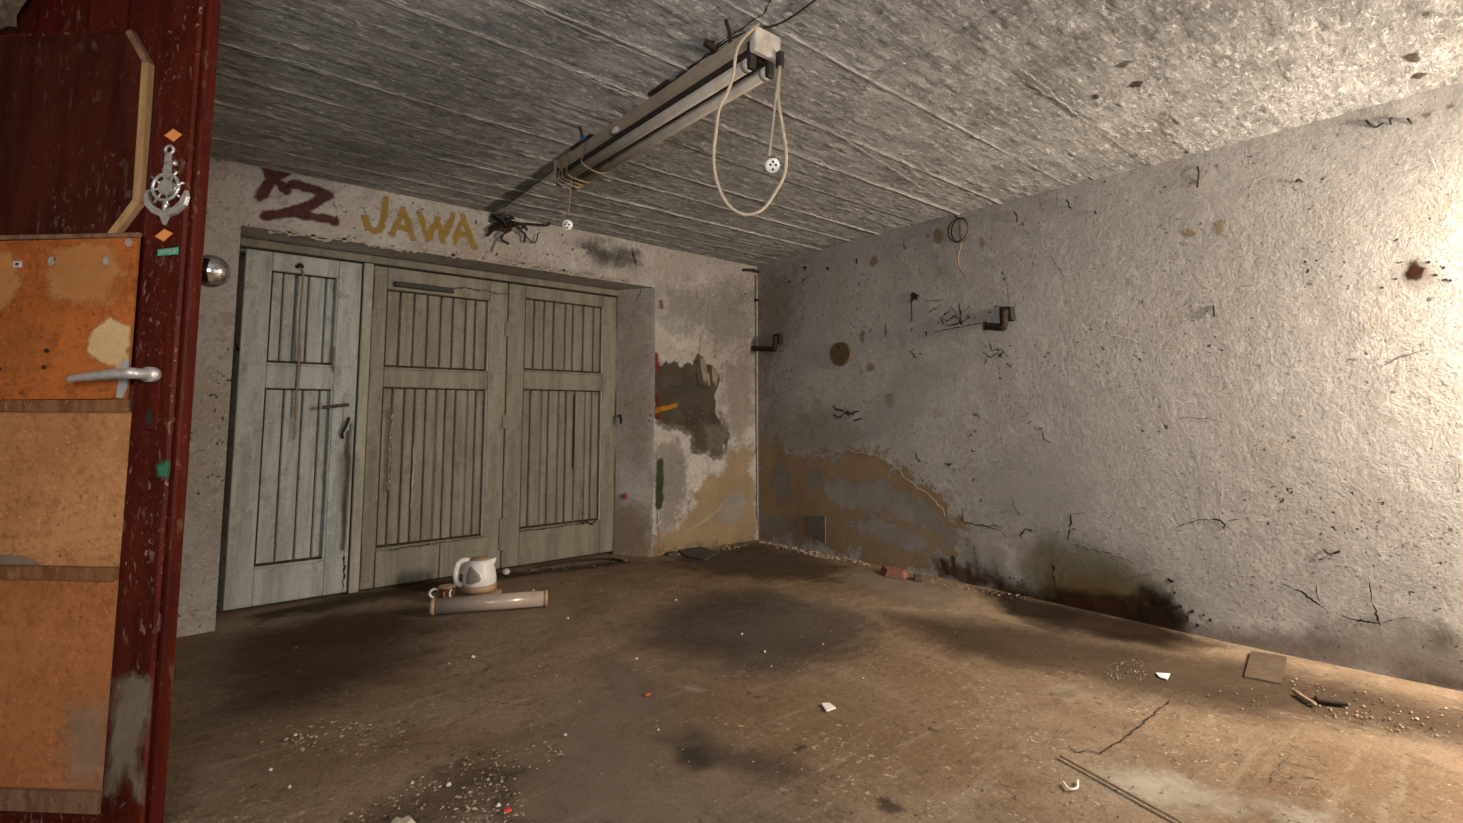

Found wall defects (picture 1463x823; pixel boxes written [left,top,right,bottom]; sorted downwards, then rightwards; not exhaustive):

peeling [654,354,971,573]
water stain [908,542,1463,739]